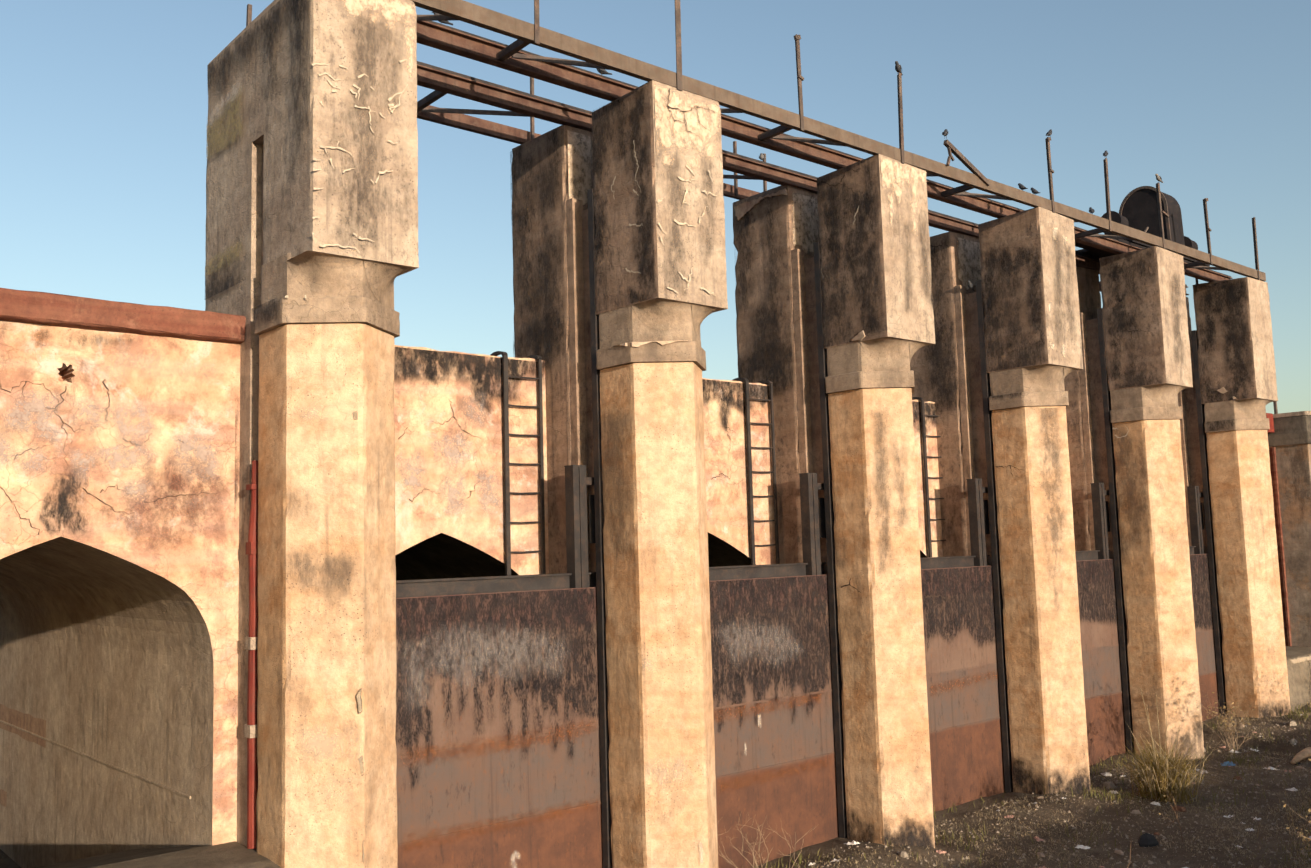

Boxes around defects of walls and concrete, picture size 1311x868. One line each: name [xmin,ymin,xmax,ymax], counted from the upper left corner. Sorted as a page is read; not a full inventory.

crack [0,379,217,535]
damp [1076,429,1147,624]
damp [395,588,599,787]
damp [709,575,831,731]
damp [921,566,996,649]